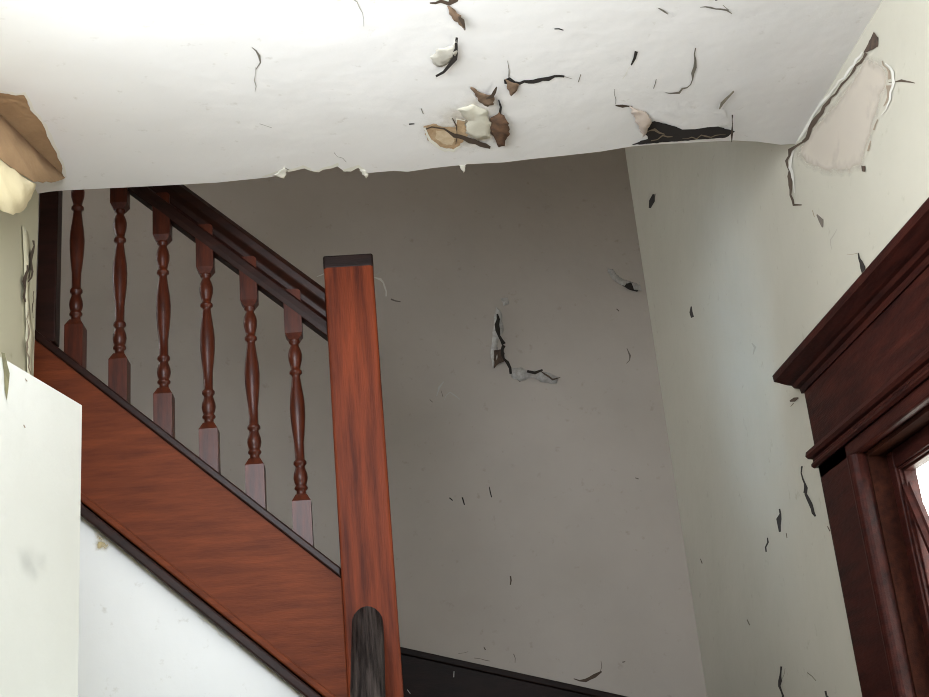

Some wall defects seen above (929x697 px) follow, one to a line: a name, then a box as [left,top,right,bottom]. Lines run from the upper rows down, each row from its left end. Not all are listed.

peeling [430,0,466,77]
crack [700,0,732,14]
peeling [409,61,581,152]
spalling [614,48,735,145]
spalling [490,298,560,384]
crack [777,666,785,697]